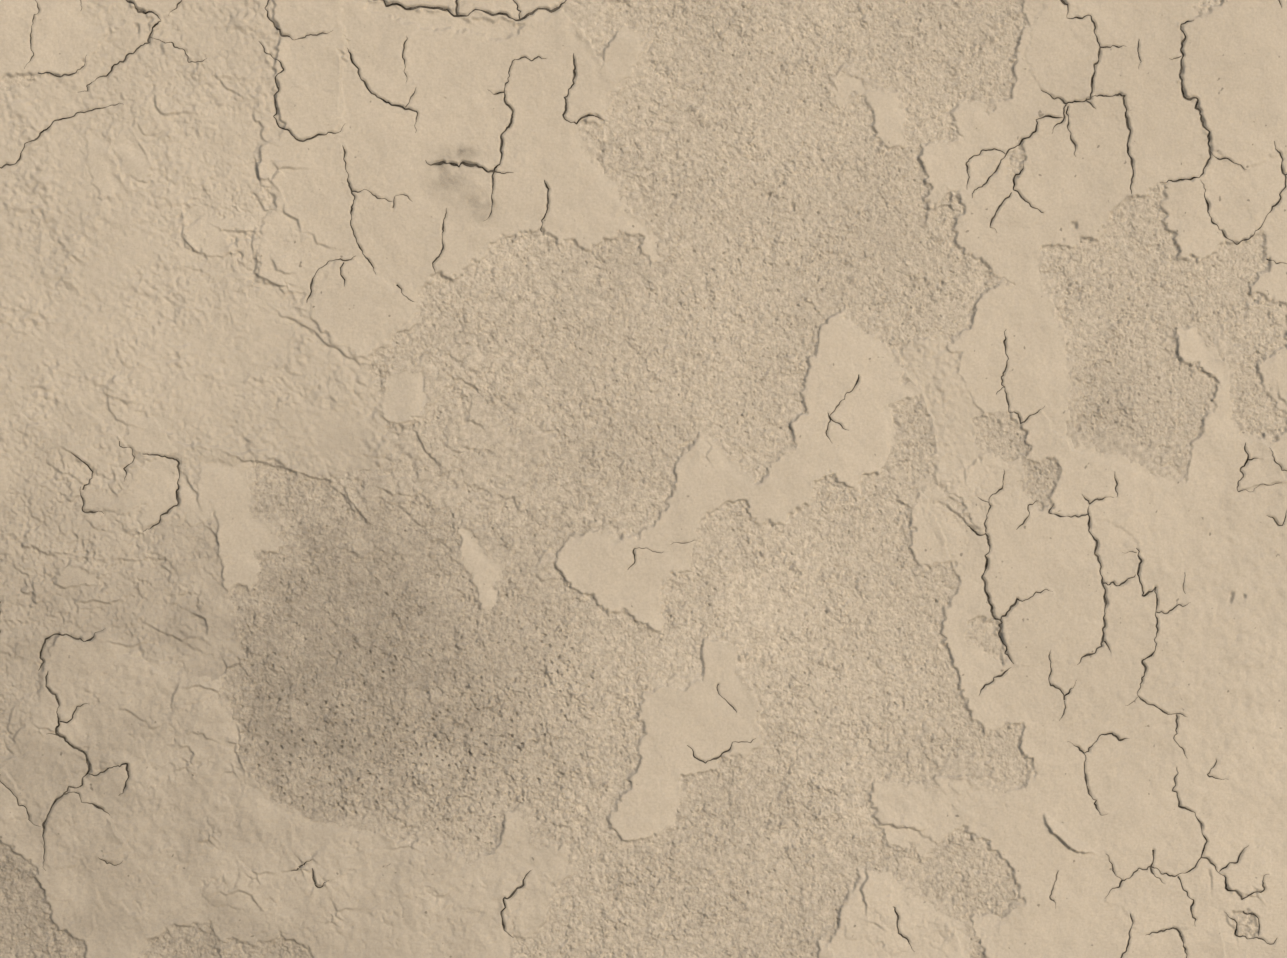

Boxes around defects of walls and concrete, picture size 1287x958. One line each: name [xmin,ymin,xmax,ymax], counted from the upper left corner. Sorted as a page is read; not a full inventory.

crack [0,0,207,169]
crack [261,0,599,302]
crack [966,0,1287,264]
crack [73,441,180,531]
peeling [0,0,396,769]
peeling [218,0,1037,958]
peeling [972,412,1065,511]
peeling [1038,183,1287,482]
crack [0,630,129,871]
crack [967,470,1276,958]
peeling [0,840,88,958]
peeling [139,922,314,958]